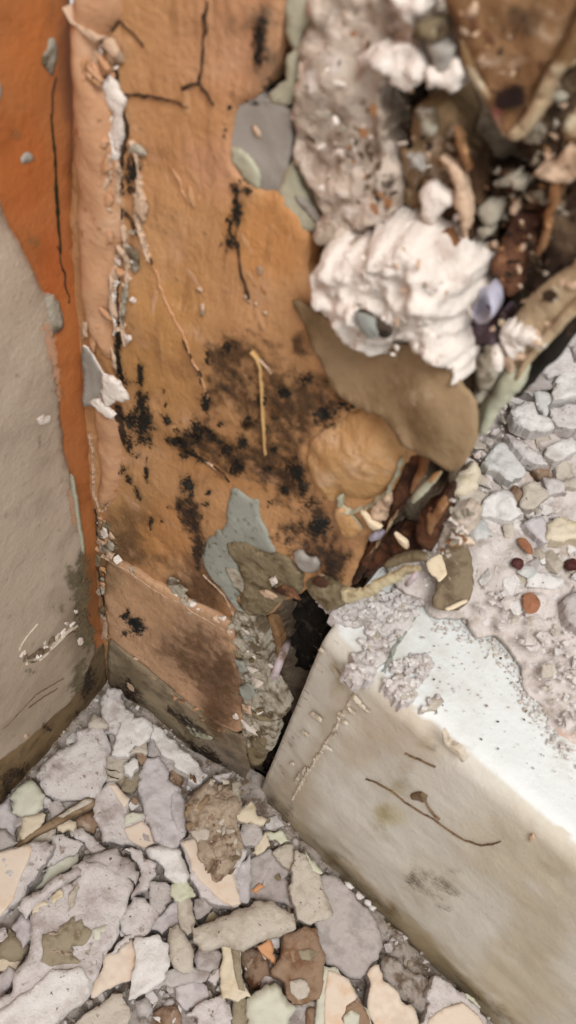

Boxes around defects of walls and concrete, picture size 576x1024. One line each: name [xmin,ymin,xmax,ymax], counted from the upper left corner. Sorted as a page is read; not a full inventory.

crack [50,77,70,304]
peeling [81,54,110,88]
water stain [120,156,142,220]
crack [62,1,214,399]
crack [236,241,268,315]
flaking render [231,0,469,232]
peeling [0,203,96,760]
water stain [109,323,356,607]
flaking render [171,488,444,777]